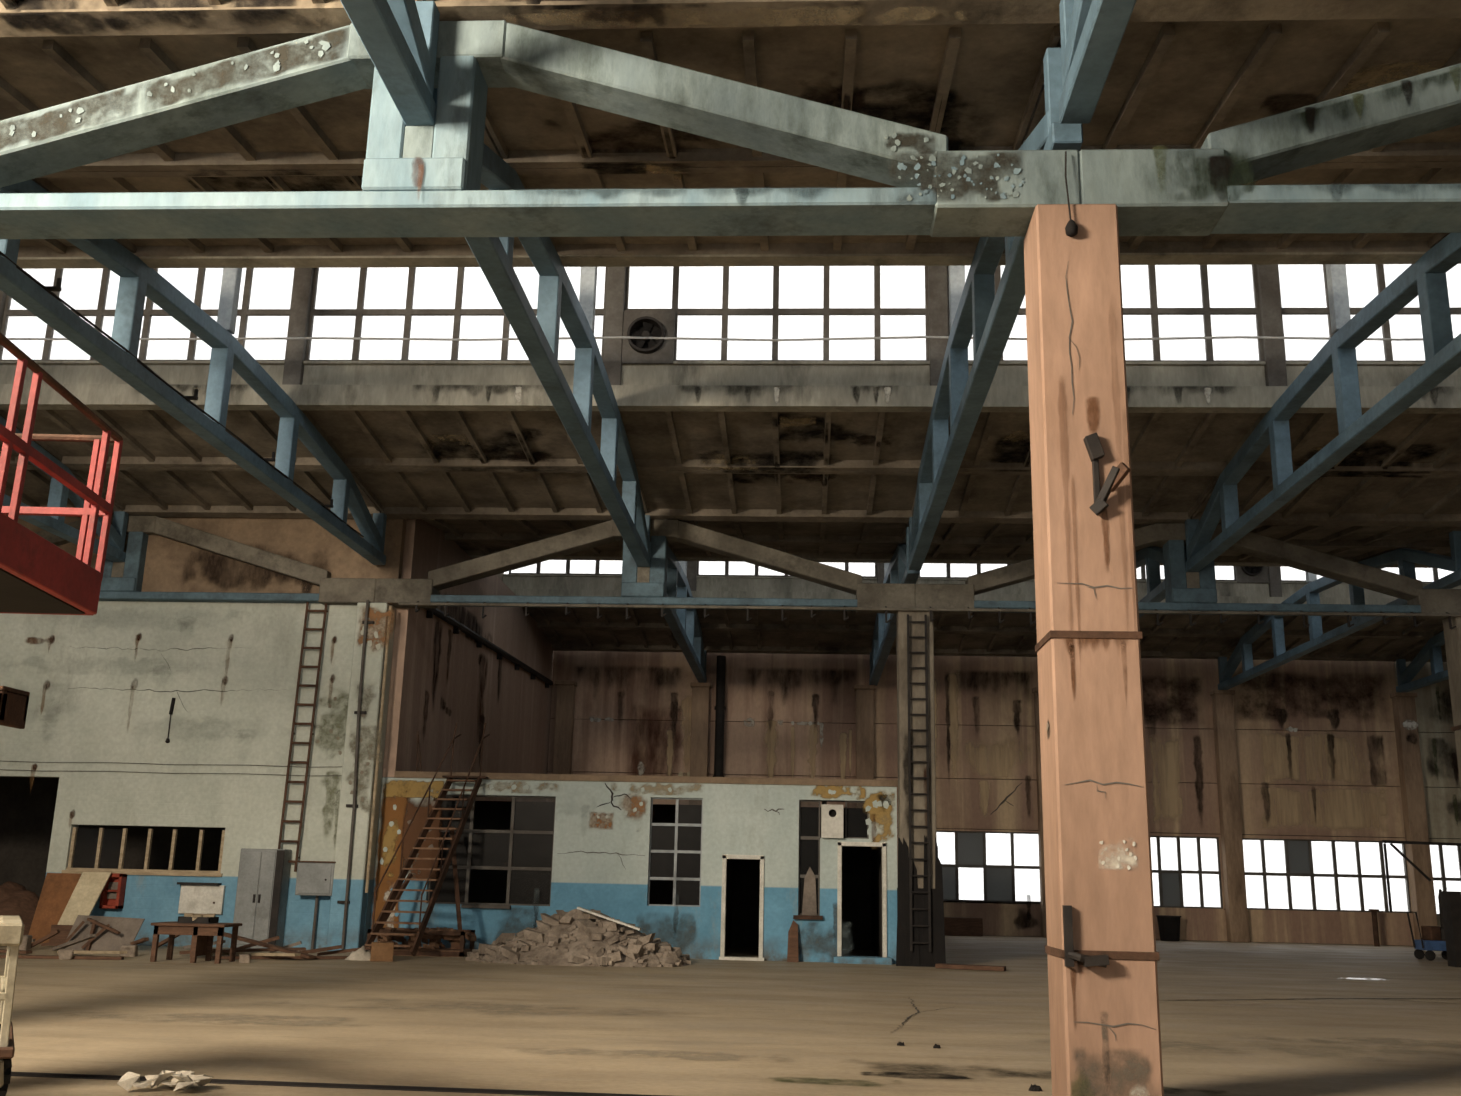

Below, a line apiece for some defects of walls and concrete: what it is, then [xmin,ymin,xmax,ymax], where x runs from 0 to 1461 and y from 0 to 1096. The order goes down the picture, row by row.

water stain [1262,62,1459,130]
peeling [884,133,1024,201]
water stain [701,385,892,486]
water stain [992,430,1031,471]
water stain [631,668,692,776]
water stain [749,669,854,779]
water stain [323,772,340,839]
flaking render [590,762,701,829]
flaking render [812,785,895,842]